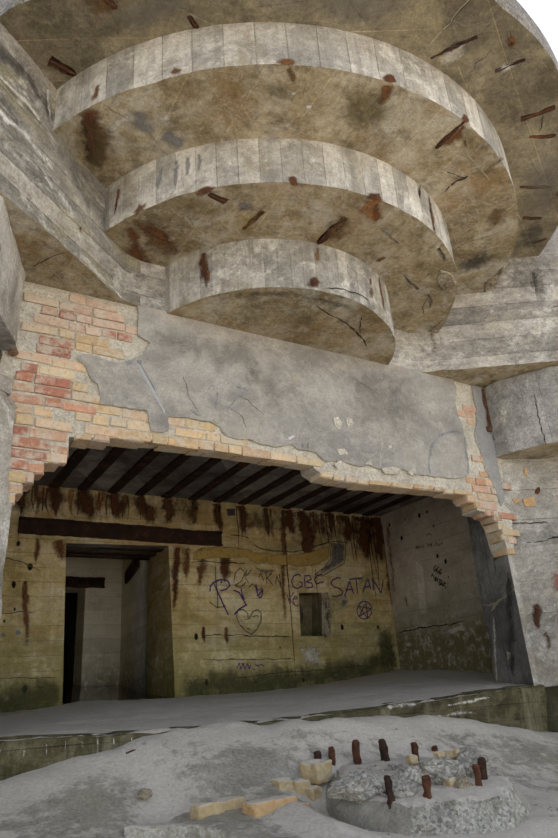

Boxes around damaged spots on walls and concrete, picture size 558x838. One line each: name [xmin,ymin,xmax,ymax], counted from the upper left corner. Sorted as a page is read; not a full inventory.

corrosion [431,35,477,60]
corrosion [80,110,111,167]
corrosion [435,114,469,149]
corrosion [521,105,555,120]
corrosion [315,216,347,261]
crack [260,278,385,347]
flaking render [7,290,322,495]
flaking render [455,388,520,548]
corrosion [533,604,550,648]